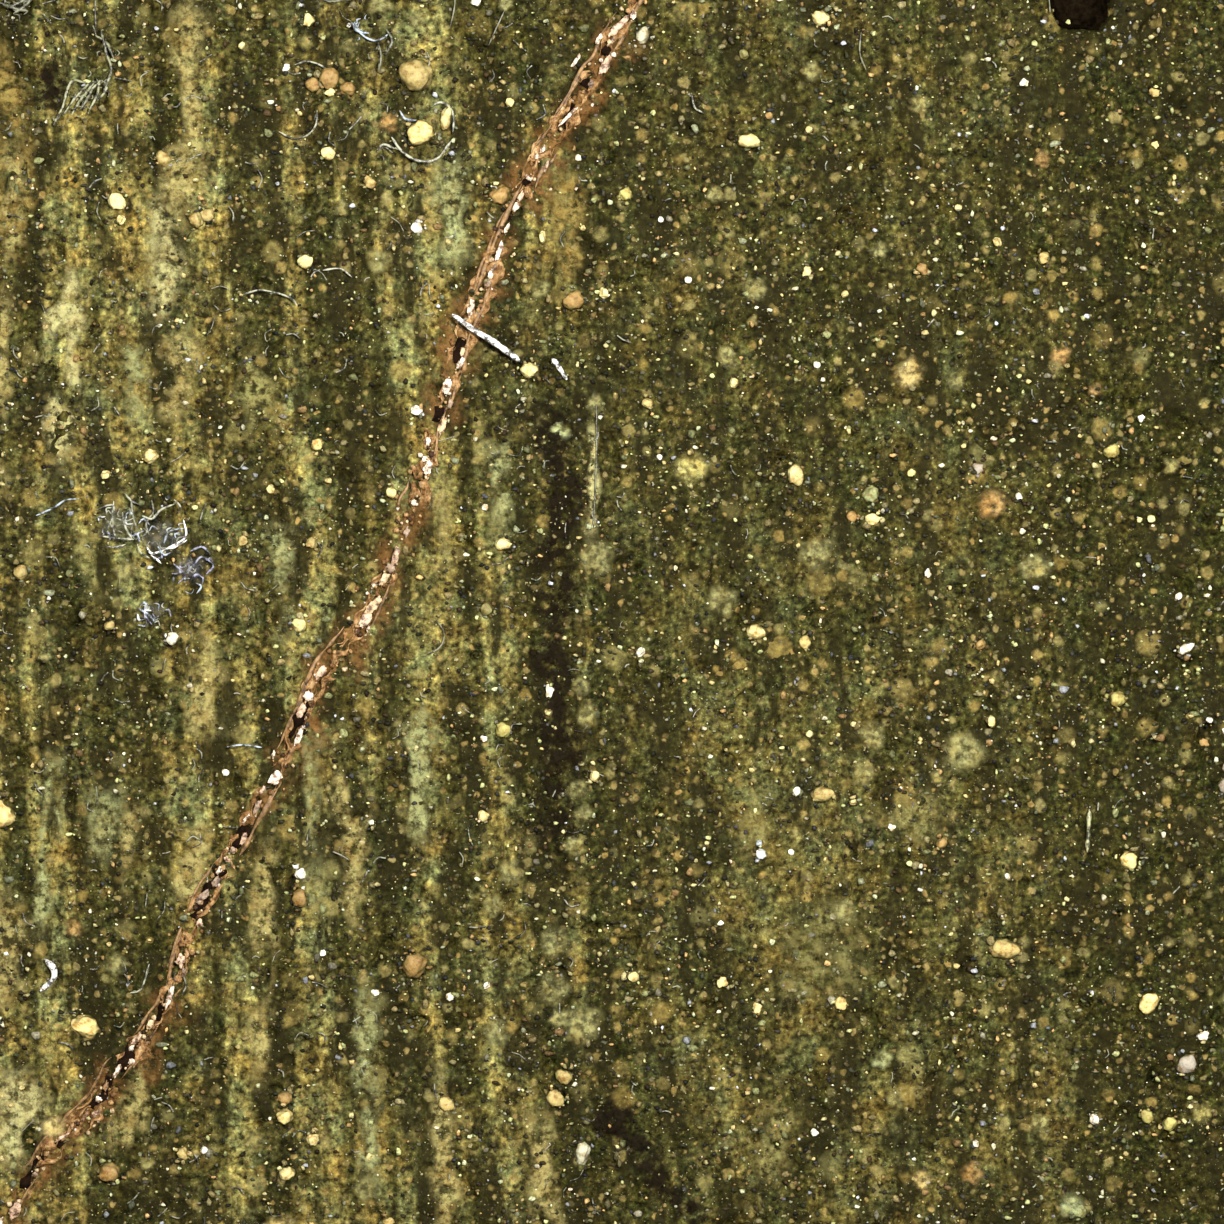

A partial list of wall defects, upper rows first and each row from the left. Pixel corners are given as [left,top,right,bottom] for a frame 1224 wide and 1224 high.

leakage [32,60,69,108]
leakage [528,404,587,850]